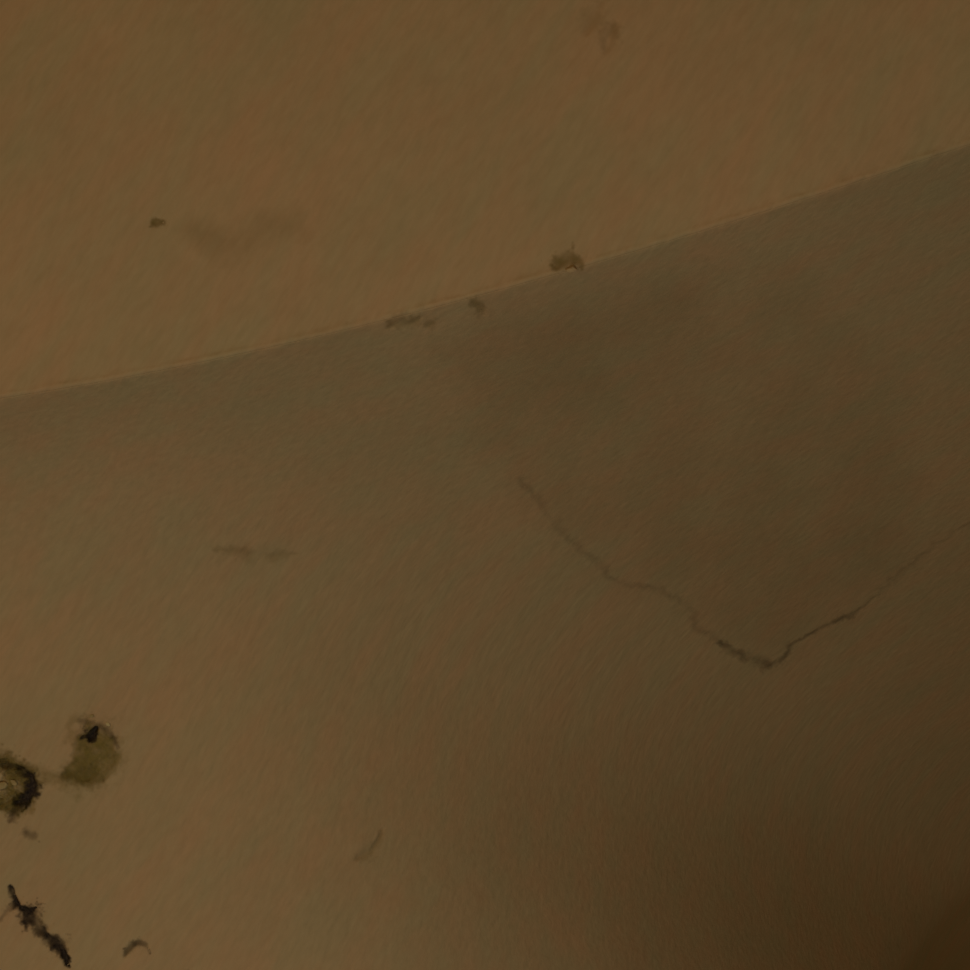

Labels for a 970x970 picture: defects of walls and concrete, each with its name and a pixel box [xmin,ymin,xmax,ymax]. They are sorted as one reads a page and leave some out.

flaking render [0,754,41,815]
crack [9,885,71,968]